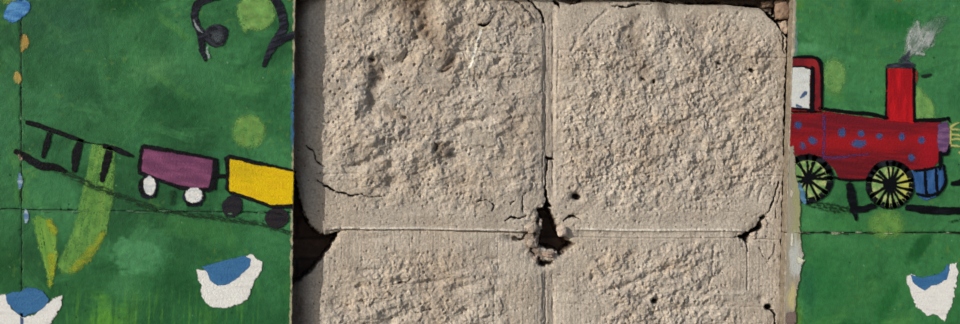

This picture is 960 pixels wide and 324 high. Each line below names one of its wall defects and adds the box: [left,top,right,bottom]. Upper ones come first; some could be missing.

crack [515,0,580,23]
crack [615,0,788,155]
crack [306,145,382,197]
crack [480,157,579,240]
spalling [523,218,543,264]
crack [746,181,783,259]